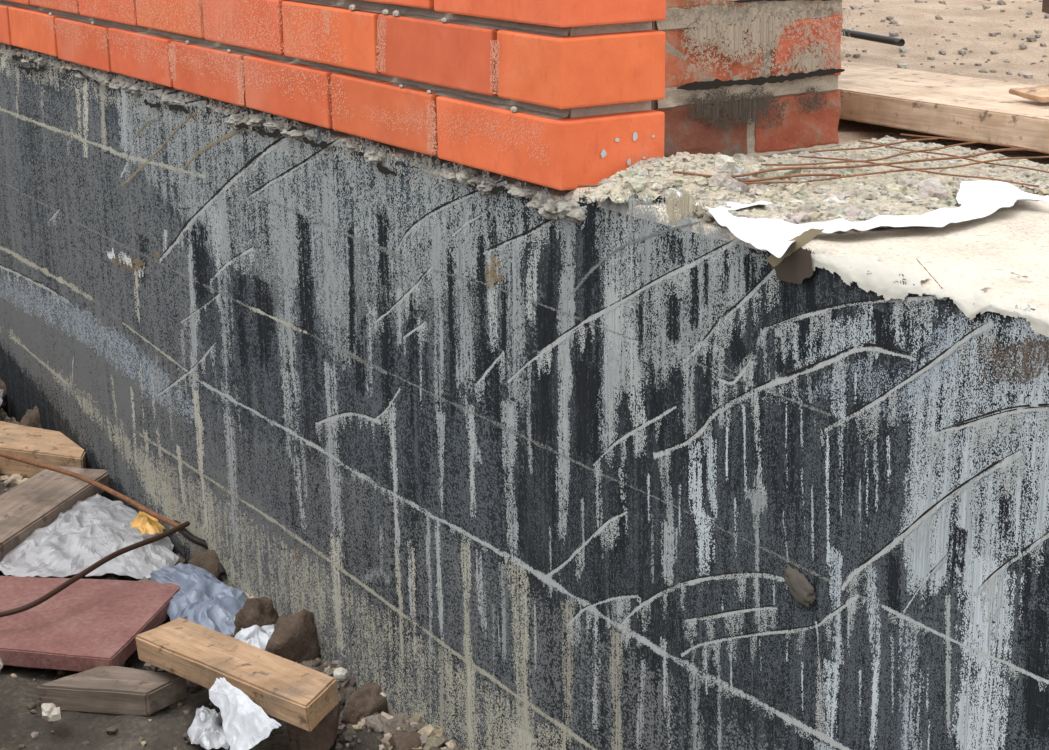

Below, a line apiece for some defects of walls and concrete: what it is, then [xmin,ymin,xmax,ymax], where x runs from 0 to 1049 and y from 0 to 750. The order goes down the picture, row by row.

crack [729,0,829,8]
crack [70,69,100,86]
crack [141,85,182,94]
crack [677,68,845,91]
efflorescence [365,100,550,165]
crack [0,99,996,515]
spalling [765,228,1049,385]
crack [0,246,1049,750]
leakage [169,532,209,562]
leakage [813,737,836,750]